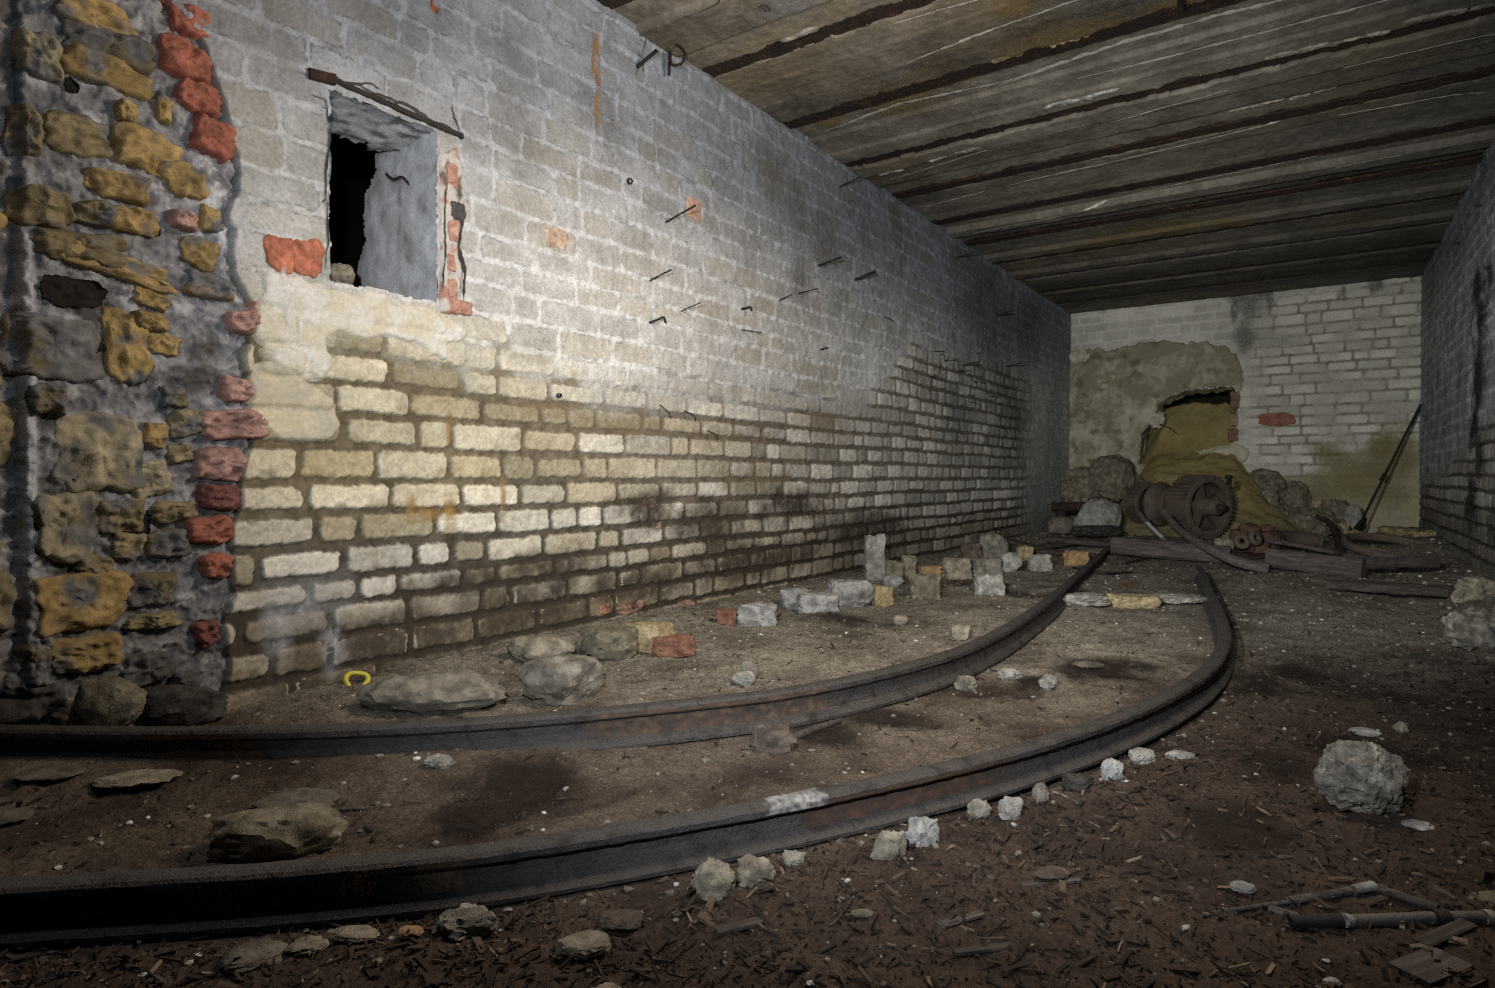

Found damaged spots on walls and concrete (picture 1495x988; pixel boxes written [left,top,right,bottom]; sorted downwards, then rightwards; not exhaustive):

corrosion [592,33,600,120]
peeling [446,161,458,184]
spalling [263,234,325,279]
peeling [447,220,473,316]
peeling [1069,348,1091,364]
spalling [1139,385,1242,465]
spalling [1258,412,1296,427]